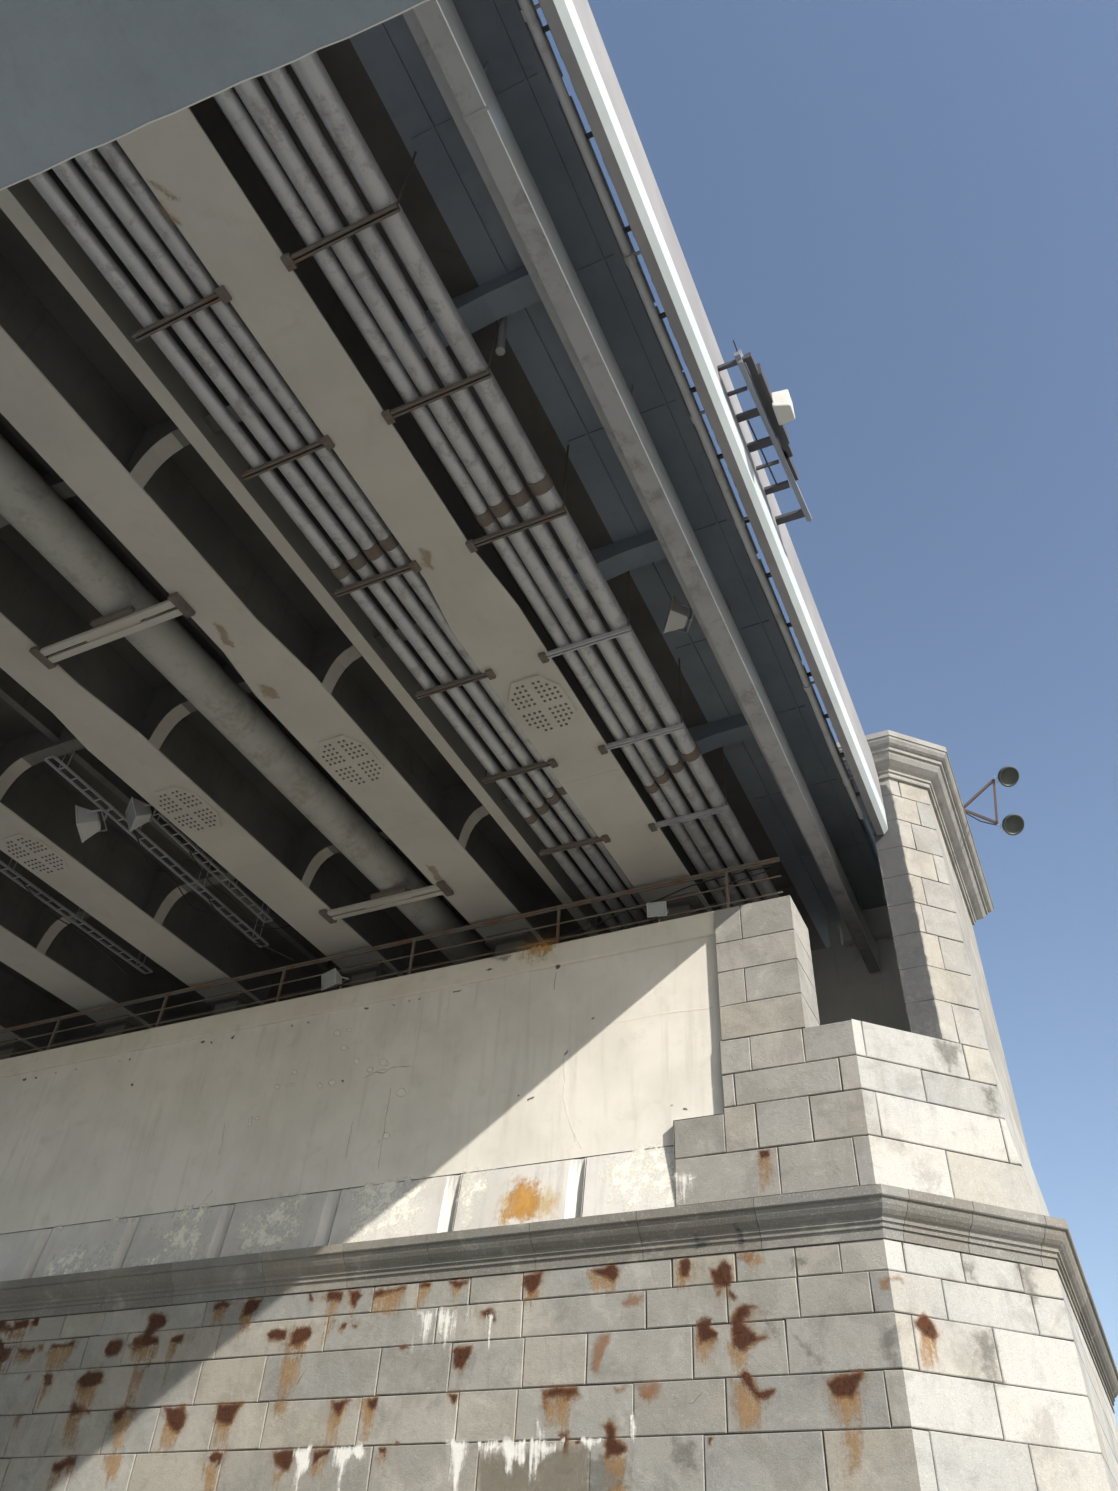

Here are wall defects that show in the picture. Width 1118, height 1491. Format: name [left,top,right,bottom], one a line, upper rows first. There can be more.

rust [502,1182,551,1223]
rust [51,1313,186,1487]
rust [203,1402,243,1487]
rust [268,1327,312,1412]
efflorescence [293,1445,312,1491]
efflorescence [333,1442,364,1491]
rust [309,1282,431,1329]
water stain [449,1421,601,1491]
rust [679,1258,691,1285]
rust [696,1252,775,1424]
rust [827,1370,864,1458]
rust [915,1315,937,1363]